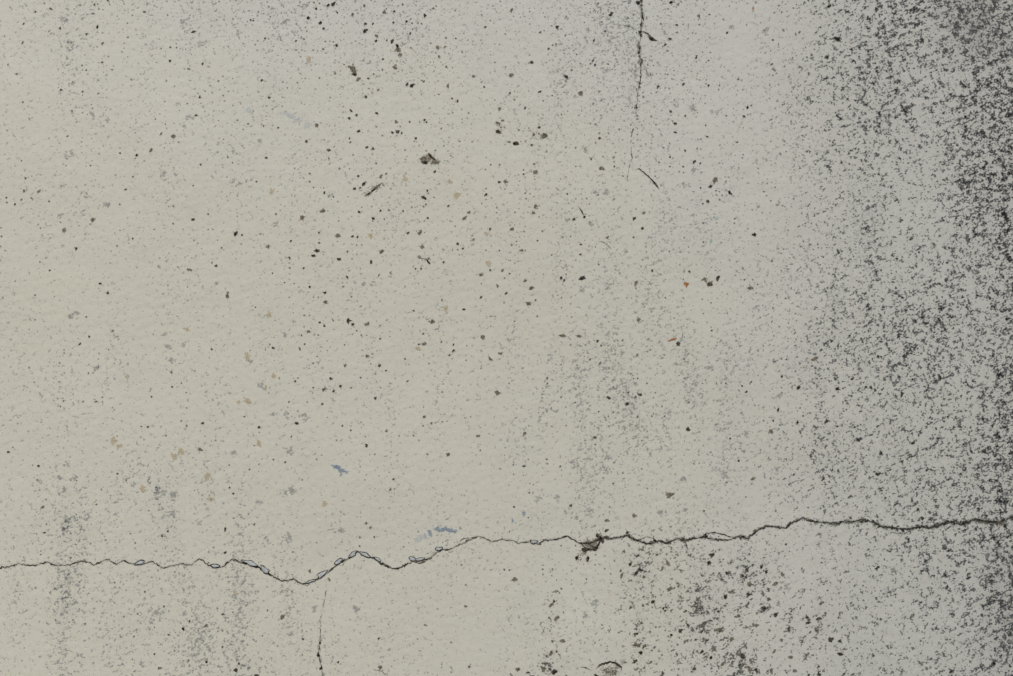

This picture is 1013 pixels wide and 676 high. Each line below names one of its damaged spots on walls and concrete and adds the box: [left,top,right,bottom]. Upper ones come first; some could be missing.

crack [625,0,657,178]
crack [0,516,1013,670]